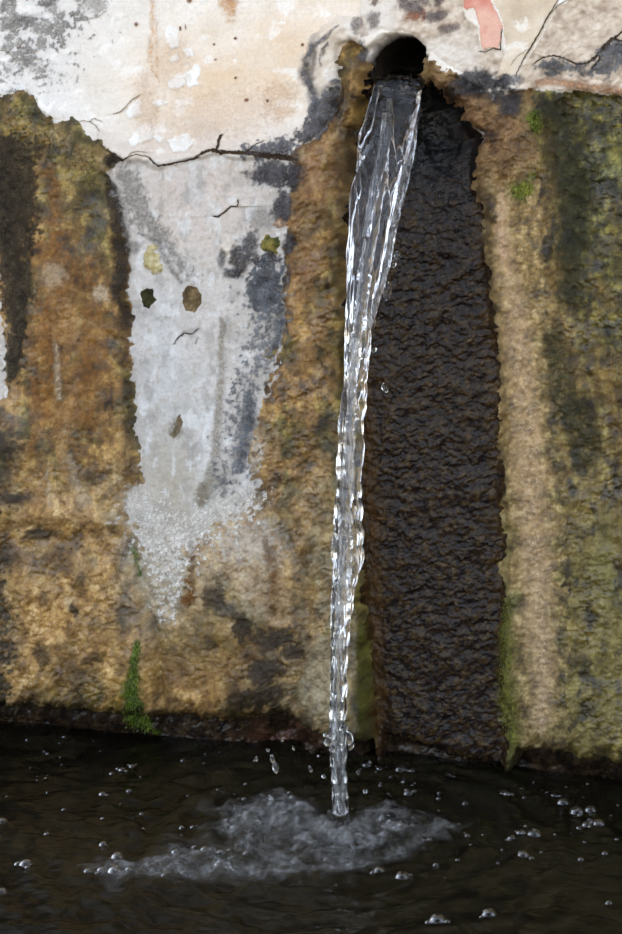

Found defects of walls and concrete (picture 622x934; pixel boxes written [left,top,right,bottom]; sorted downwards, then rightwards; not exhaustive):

mould [0,0,106,99]
peeling [164,25,201,89]
crack [76,95,294,167]
damp [449,67,523,118]
flaking render [359,0,622,95]
crack [512,0,622,77]
damp [542,97,602,304]
damp [0,125,50,388]
flaking render [107,99,291,549]
damp [93,30,341,624]
damp [22,529,58,540]
damp [0,571,329,740]